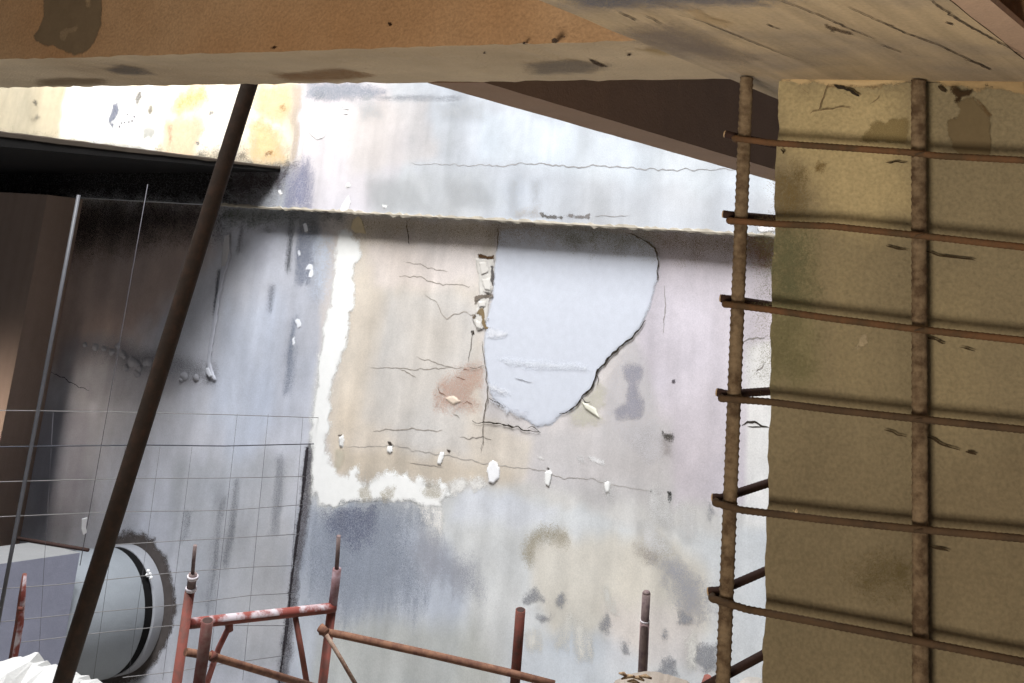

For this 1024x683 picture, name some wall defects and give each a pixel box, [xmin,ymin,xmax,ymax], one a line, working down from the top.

damp [33,0,102,56]
crack [803,84,879,113]
crack [416,162,733,172]
spalling [472,254,495,332]
crack [346,215,666,494]
peeling [581,401,601,419]
damp [611,363,645,422]
damp [287,497,489,642]
damp [517,522,571,571]
damp [631,483,719,678]
damp [523,585,621,665]